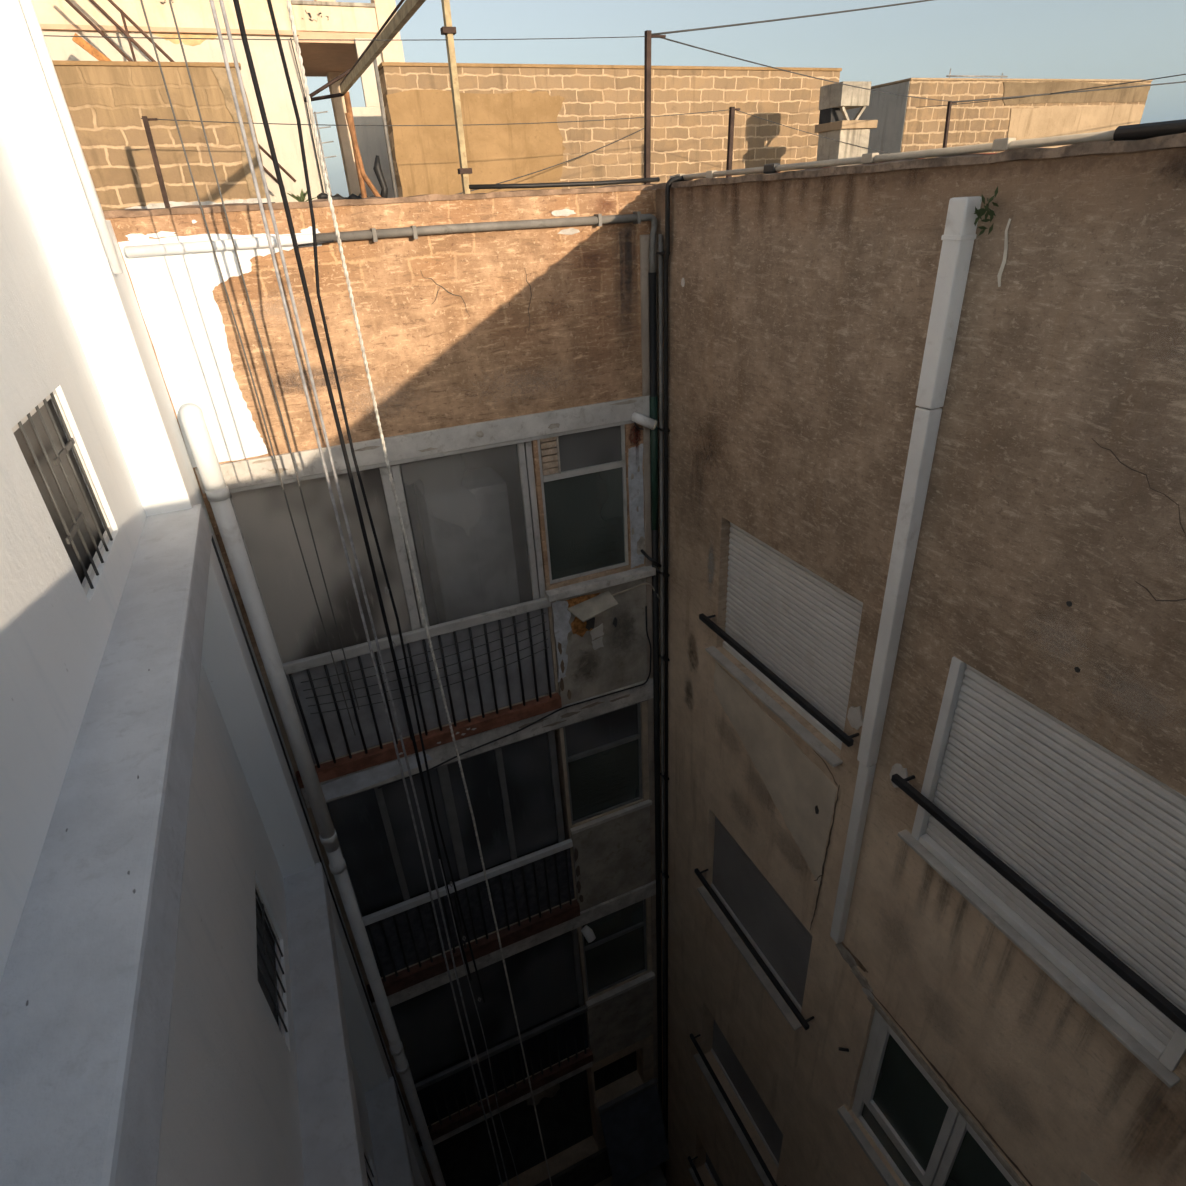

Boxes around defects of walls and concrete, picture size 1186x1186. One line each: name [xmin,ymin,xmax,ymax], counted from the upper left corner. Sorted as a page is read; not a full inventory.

crack [1094,440,1186,536]
crack [1134,580,1186,602]